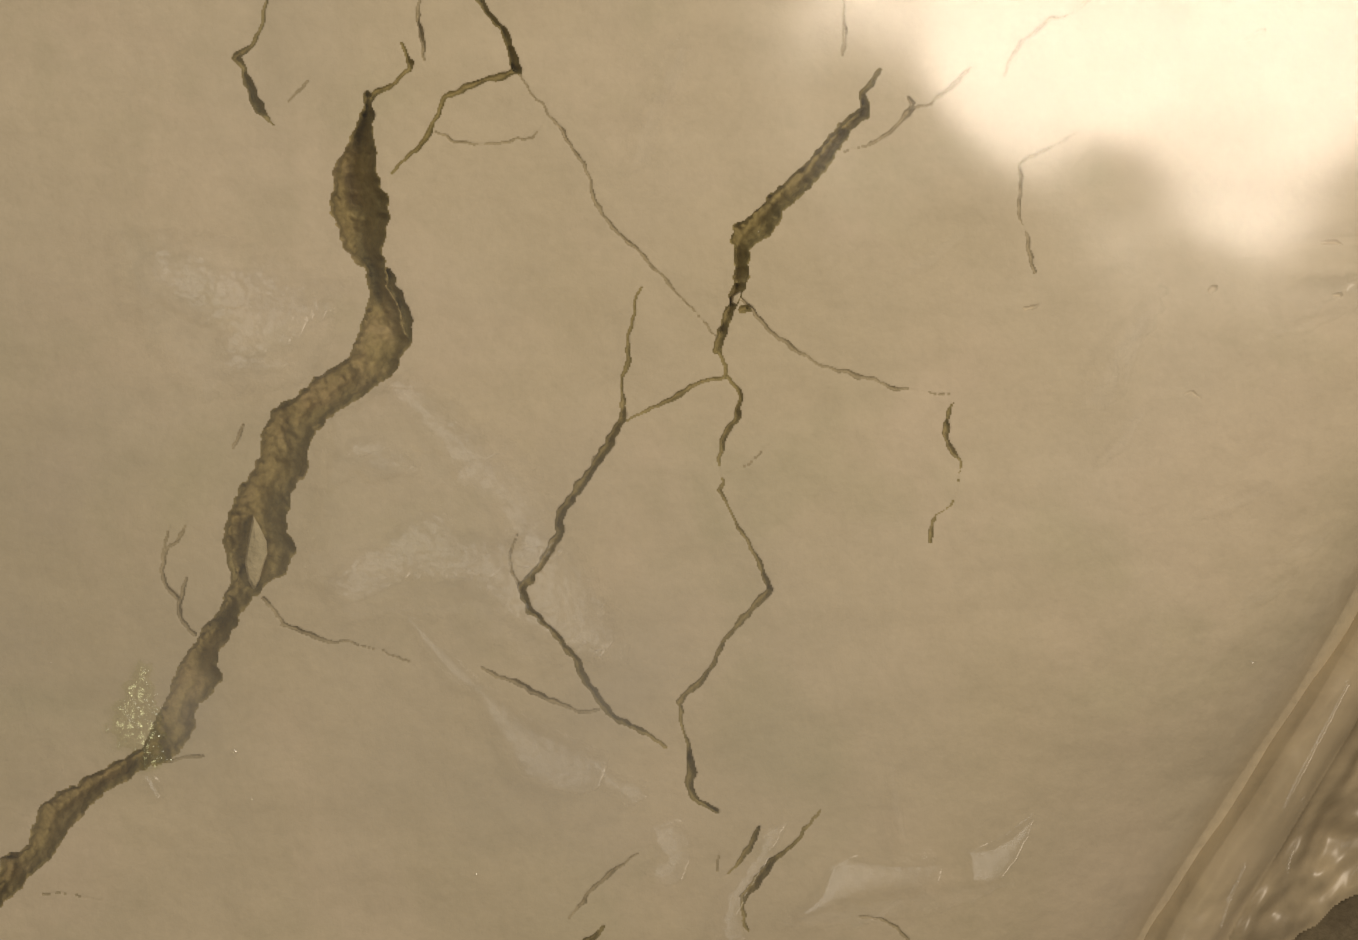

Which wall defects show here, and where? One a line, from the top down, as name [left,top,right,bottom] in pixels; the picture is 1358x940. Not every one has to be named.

crack [1003,0,1092,77]
crack [1017,132,1077,274]
crack [0,0,972,908]
crack [568,853,639,940]
crack [716,809,821,932]
crack [859,915,910,940]